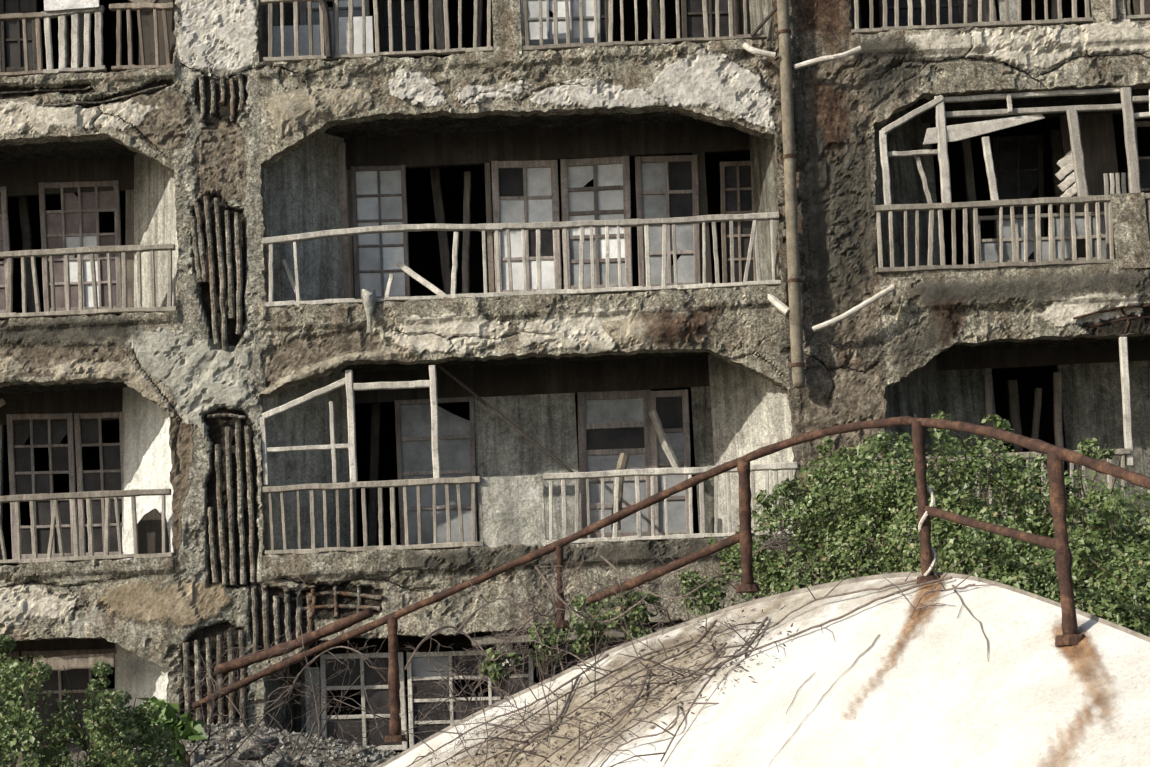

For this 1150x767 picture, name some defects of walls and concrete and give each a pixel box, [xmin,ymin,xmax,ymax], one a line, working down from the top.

corrosion [793,0,849,40]
peeling [388,50,775,131]
crack [874,46,1150,108]
peeling [1033,291,1150,336]
spalling [0,0,716,727]
corrosion [878,575,942,676]
corrosion [1051,626,1105,767]